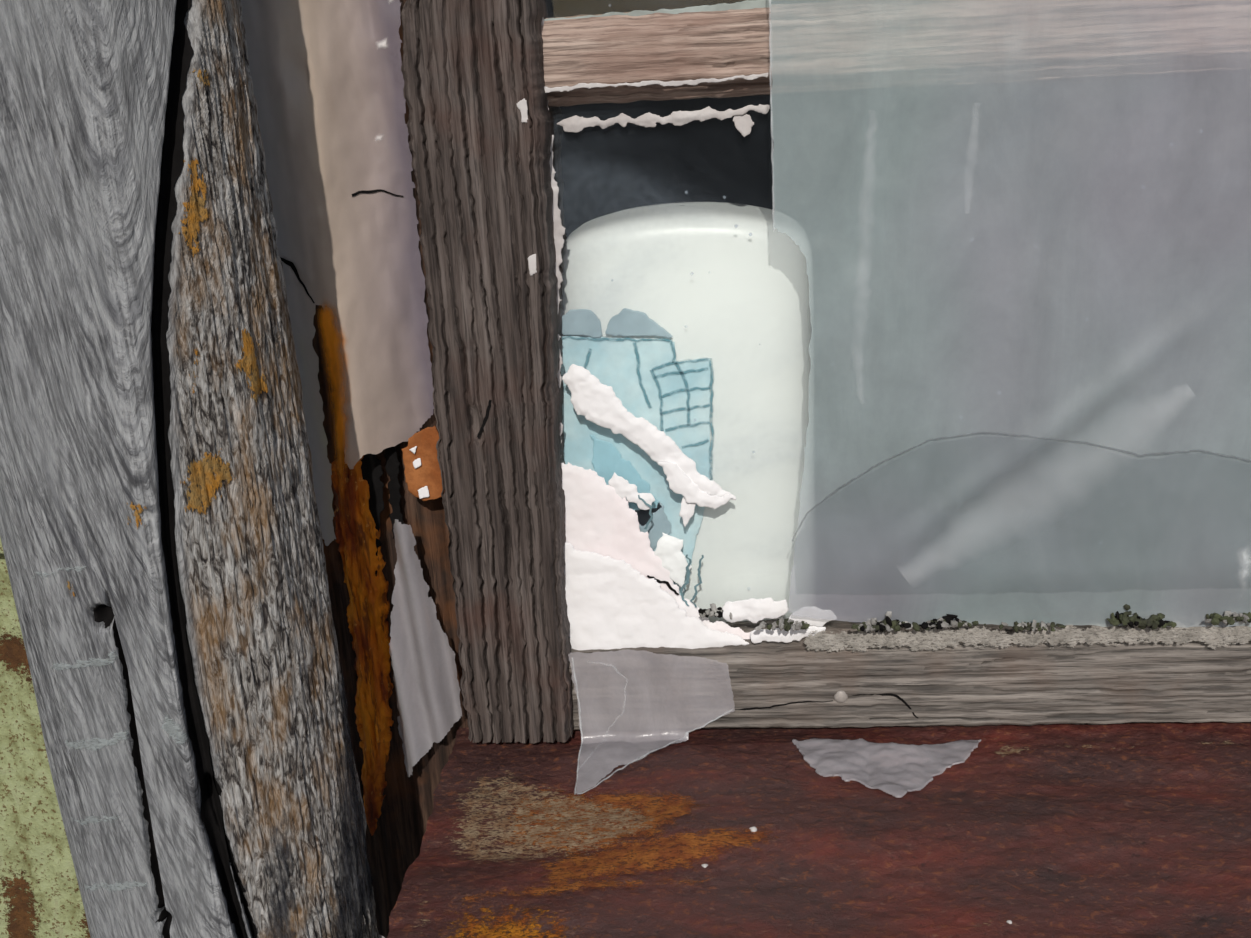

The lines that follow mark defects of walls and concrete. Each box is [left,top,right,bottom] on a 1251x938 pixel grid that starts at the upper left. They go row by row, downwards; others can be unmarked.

peeling [516,98,528,123]
peeling [544,73,768,110]
peeling [528,254,537,276]
peeling [549,104,770,313]
peeling [320,306,346,477]
crack [152,0,258,938]
peeling [361,426,445,577]
crack [112,619,172,938]
crack [735,693,918,718]
rust [439,789,778,938]